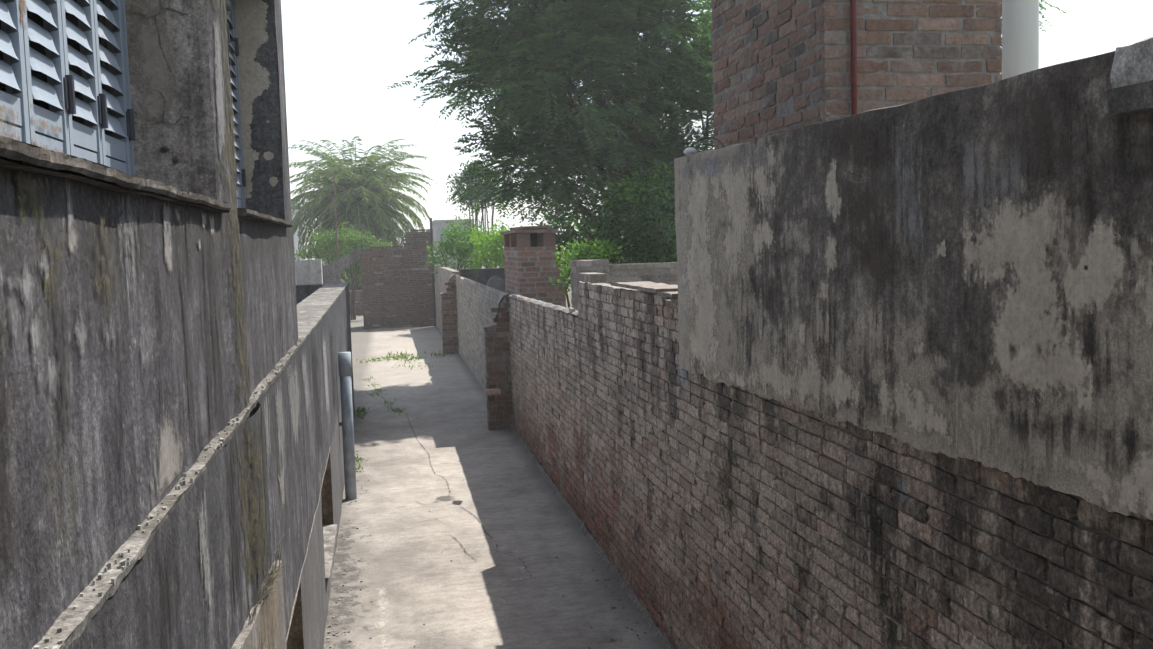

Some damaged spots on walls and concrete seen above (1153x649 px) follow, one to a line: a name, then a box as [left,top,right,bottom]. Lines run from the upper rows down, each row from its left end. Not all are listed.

peeling [235,0,274,204]
damp [892,136,924,252]
damp [964,80,1076,209]
damp [1083,312,1110,392]
flaking render [150,418,183,505]
crack [369,381,531,576]
damp [1046,407,1135,463]
damp [834,451,910,648]